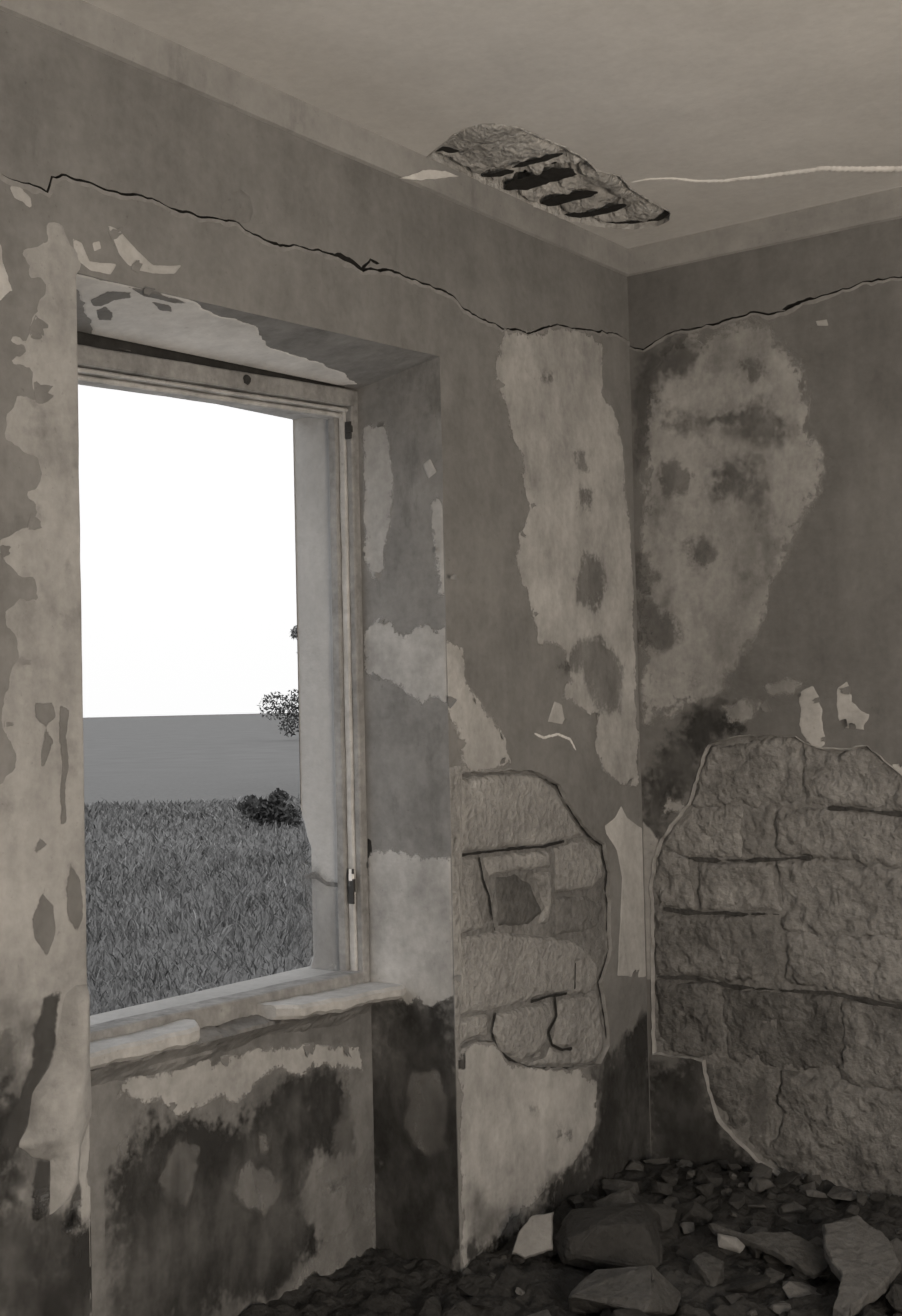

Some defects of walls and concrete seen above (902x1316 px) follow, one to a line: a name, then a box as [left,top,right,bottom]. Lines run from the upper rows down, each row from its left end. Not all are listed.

crack [0,173,902,353]
flaking render [399,123,671,230]
crack [632,166,902,183]
peeling [362,421,393,580]
peeling [423,459,436,478]
peeling [431,499,456,595]
peeling [493,327,640,787]
damp [636,320,825,756]
peeling [0,222,363,1316]
flaking render [364,616,902,1267]
damp [0,995,92,1316]
damp [109,1067,354,1316]